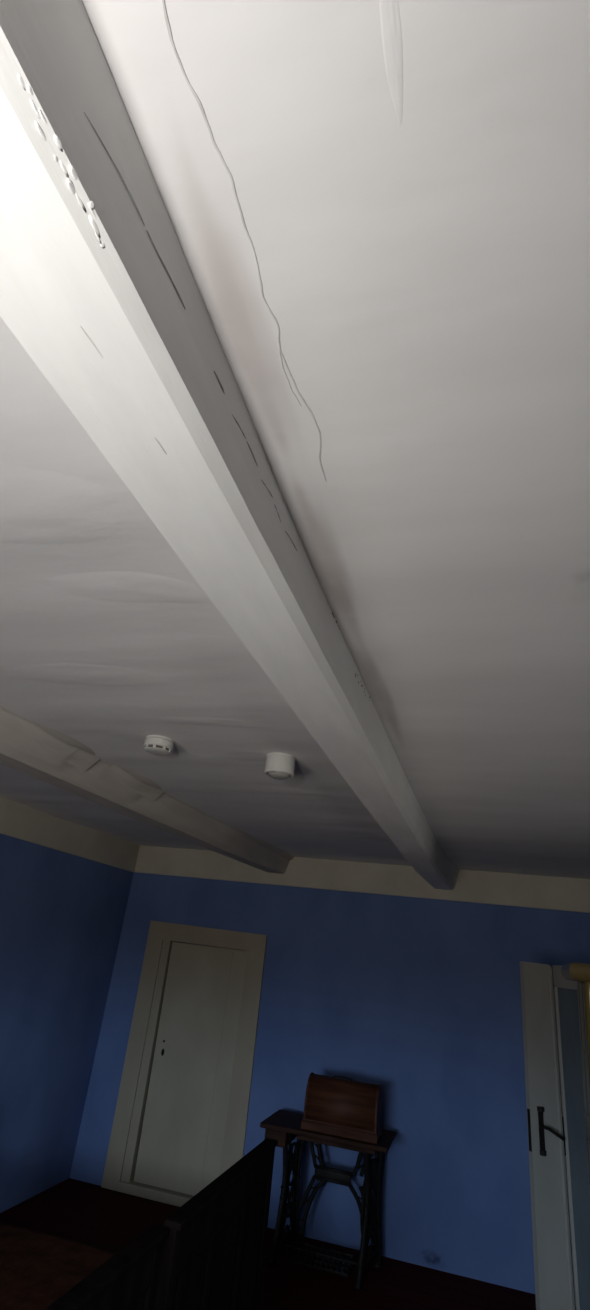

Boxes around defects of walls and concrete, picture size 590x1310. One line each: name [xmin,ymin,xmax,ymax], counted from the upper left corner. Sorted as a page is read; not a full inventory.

flaking render [18,73,105,248]
crack [84,112,186,309]
crack [162,0,326,480]
crack [214,371,297,550]